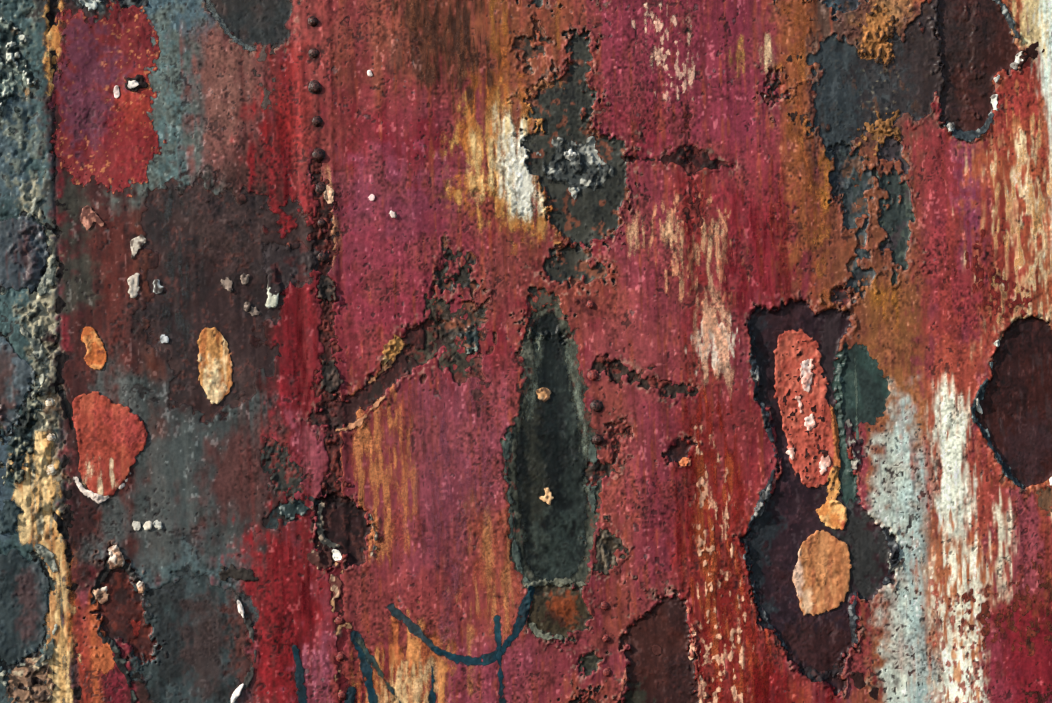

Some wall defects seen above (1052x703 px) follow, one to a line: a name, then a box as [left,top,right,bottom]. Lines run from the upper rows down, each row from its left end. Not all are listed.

peeling [0,15,38,131]
rust [954,148,1052,322]
peeling [470,0,639,643]
peeling [558,0,1052,703]
peeling [0,391,44,484]
peeling [0,499,23,534]
rust [954,553,1052,656]
peeling [5,651,56,703]